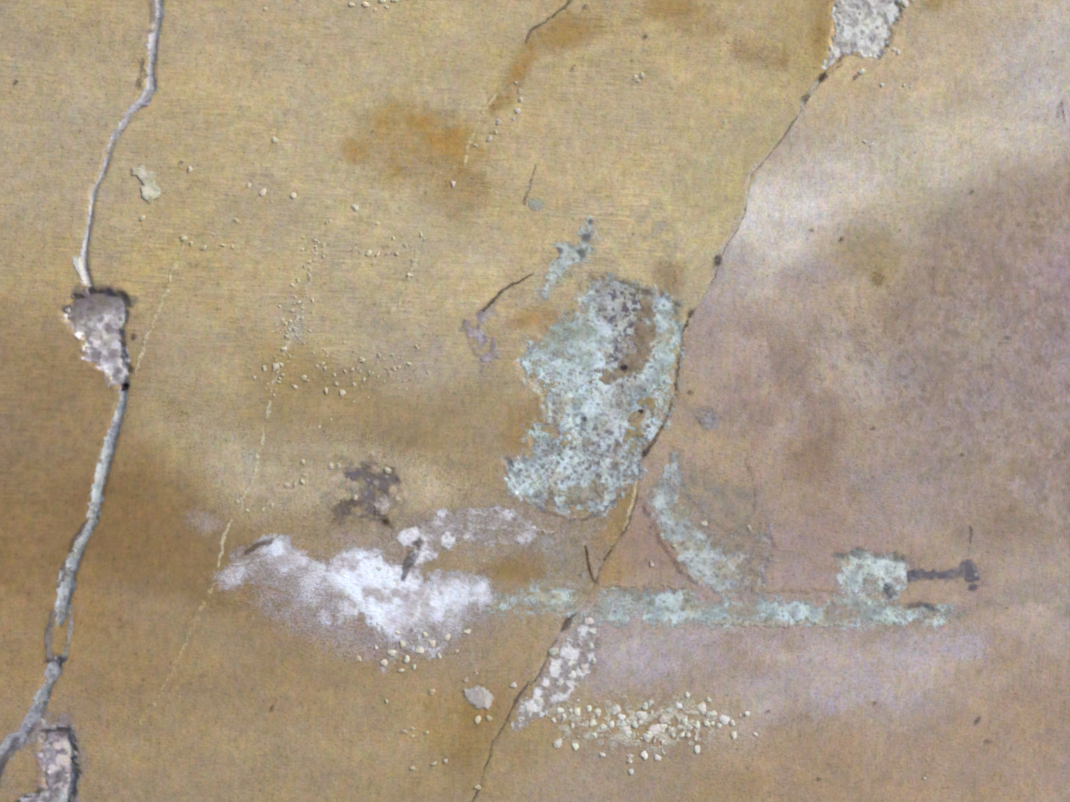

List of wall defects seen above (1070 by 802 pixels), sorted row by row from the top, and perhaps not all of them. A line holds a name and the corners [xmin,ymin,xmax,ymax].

crack [525,0,572,42]
spalling [822,0,915,80]
crack [71,0,165,288]
crack [463,94,498,167]
spalling [55,281,139,392]
crack [0,247,184,783]
leakage [0,278,626,684]
spalling [284,448,416,538]
crack [473,60,843,802]
peeling [486,213,1070,776]
spalling [0,702,89,802]
peeling [463,671,494,724]